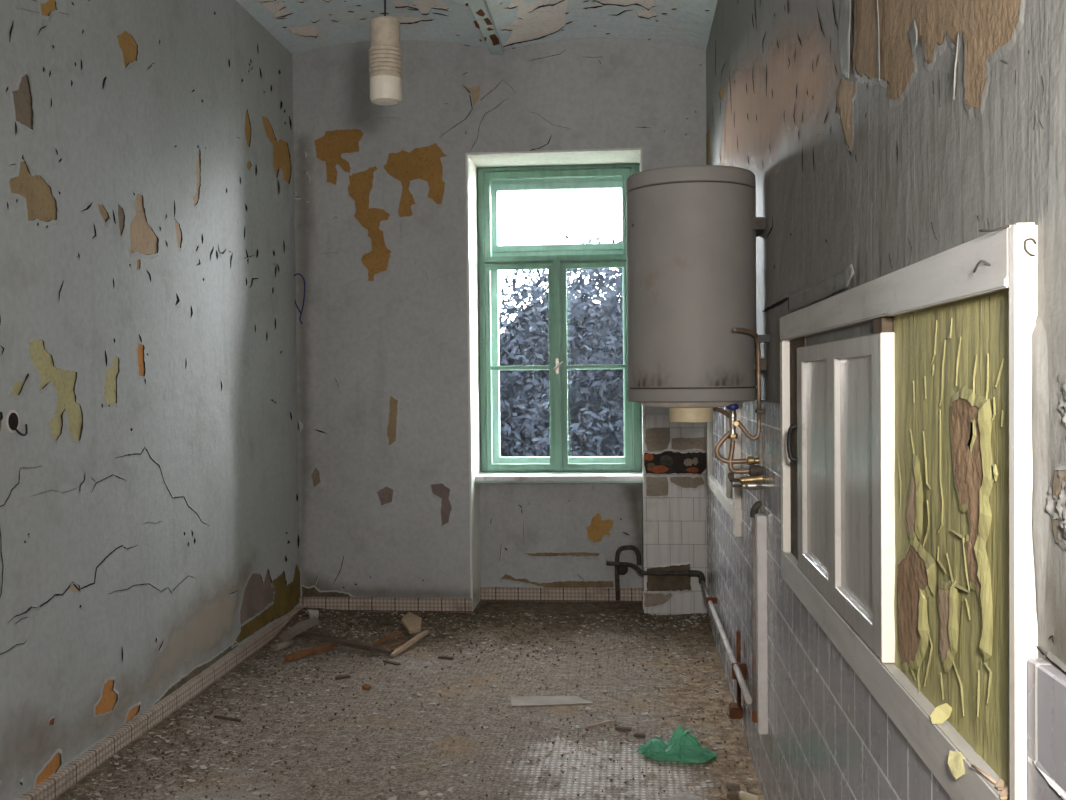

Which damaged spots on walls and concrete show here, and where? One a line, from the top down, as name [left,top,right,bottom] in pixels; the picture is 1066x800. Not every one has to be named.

peeling [6,71,35,135]
peeling [236,43,309,203]
crack [439,79,573,152]
peeling [794,0,1026,172]
peeling [6,156,61,229]
peeling [81,191,183,281]
peeling [196,226,260,281]
peeling [7,335,85,445]
crack [0,447,210,656]
peeling [518,503,630,562]
peeling [896,318,1004,724]
spalling [93,532,357,725]